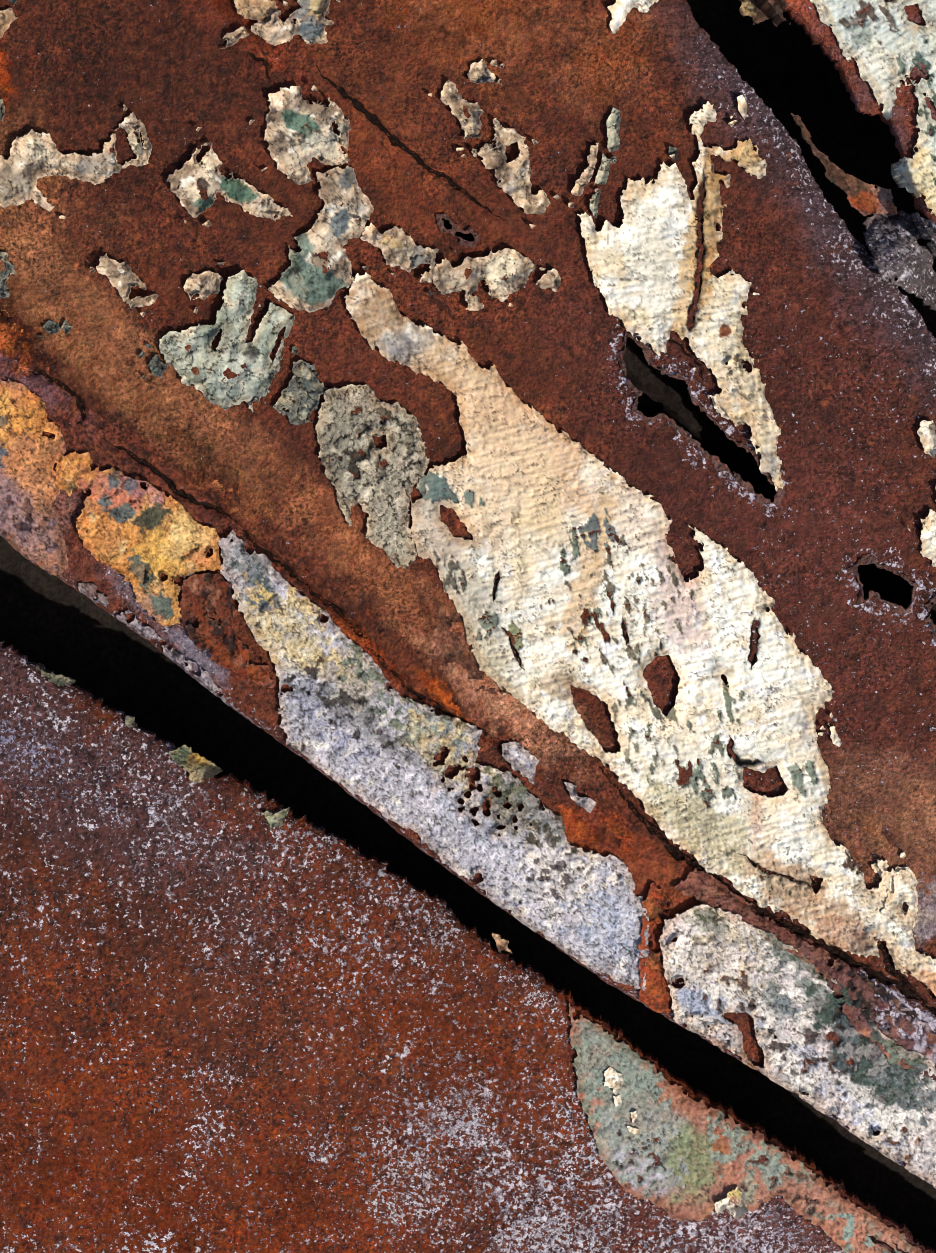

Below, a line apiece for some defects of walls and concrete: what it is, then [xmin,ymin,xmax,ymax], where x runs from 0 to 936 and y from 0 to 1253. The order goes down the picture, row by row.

corrosion [739,0,791,27]
corrosion [790,113,898,216]
peeling [810,0,936,216]
crack [24,368,502,748]
corrosion [211,450,557,766]
crack [493,570,525,670]
peeling [139,59,936,996]
crack [748,620,761,670]
peeling [0,378,936,1188]
crack [599,766,936,1015]
corrosion [638,868,936,1080]
peeling [569,1000,923,1253]